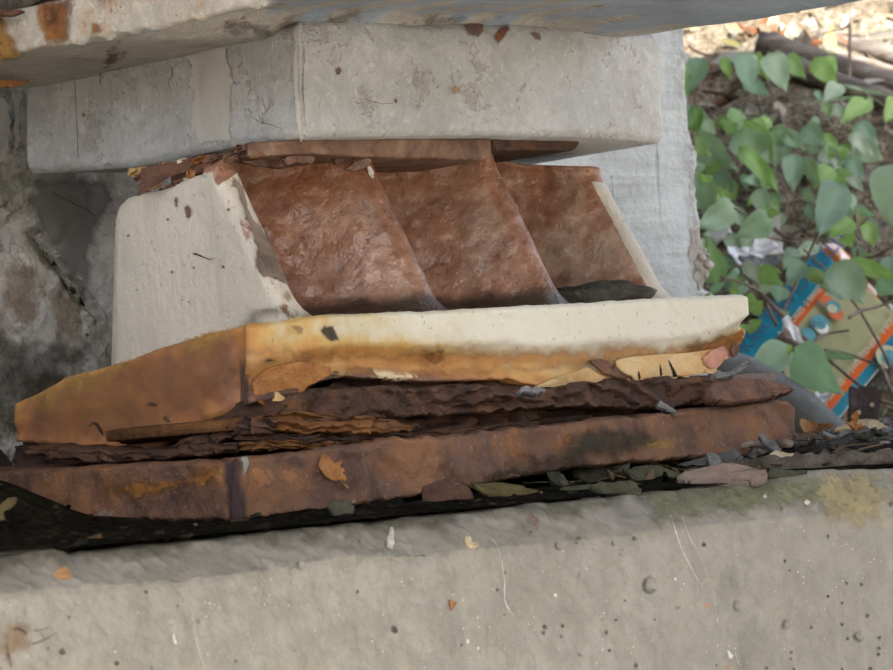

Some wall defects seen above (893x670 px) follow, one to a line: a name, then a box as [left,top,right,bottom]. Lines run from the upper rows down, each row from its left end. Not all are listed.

rust [0,9,25,60]
rust [38,1,69,42]
rust [233,181,291,299]
rust [11,329,808,519]